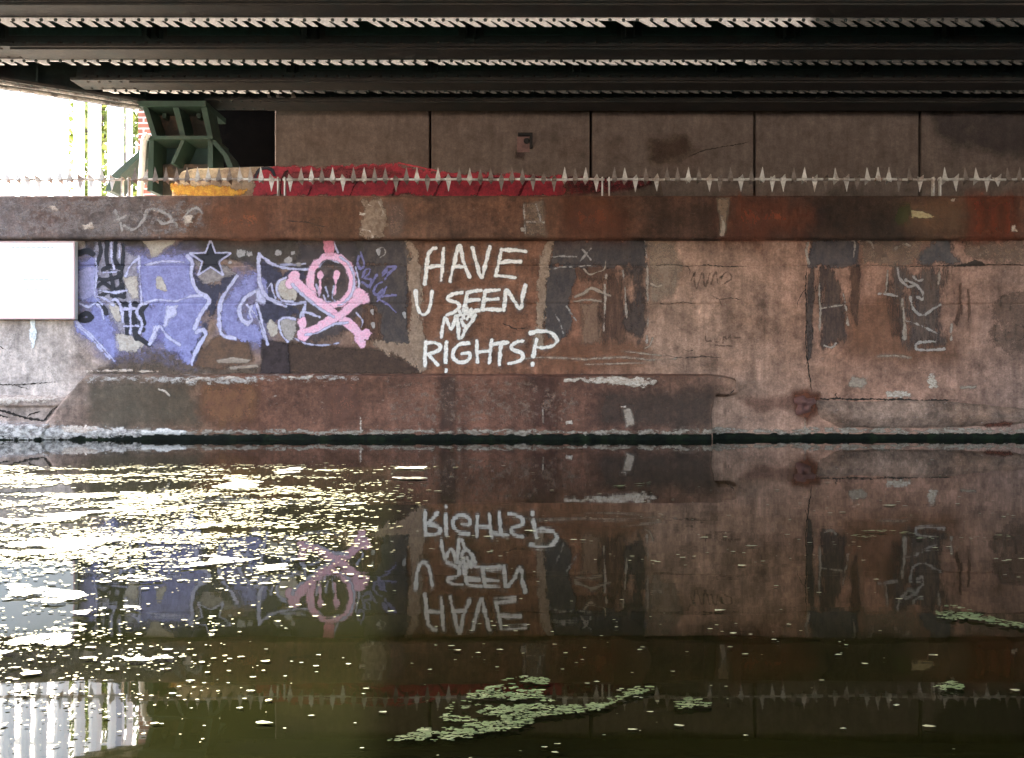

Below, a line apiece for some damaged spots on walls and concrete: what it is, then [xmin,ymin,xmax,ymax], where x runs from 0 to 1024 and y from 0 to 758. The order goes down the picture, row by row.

crack [797,271,960,403]
corrosion [200,383,257,426]